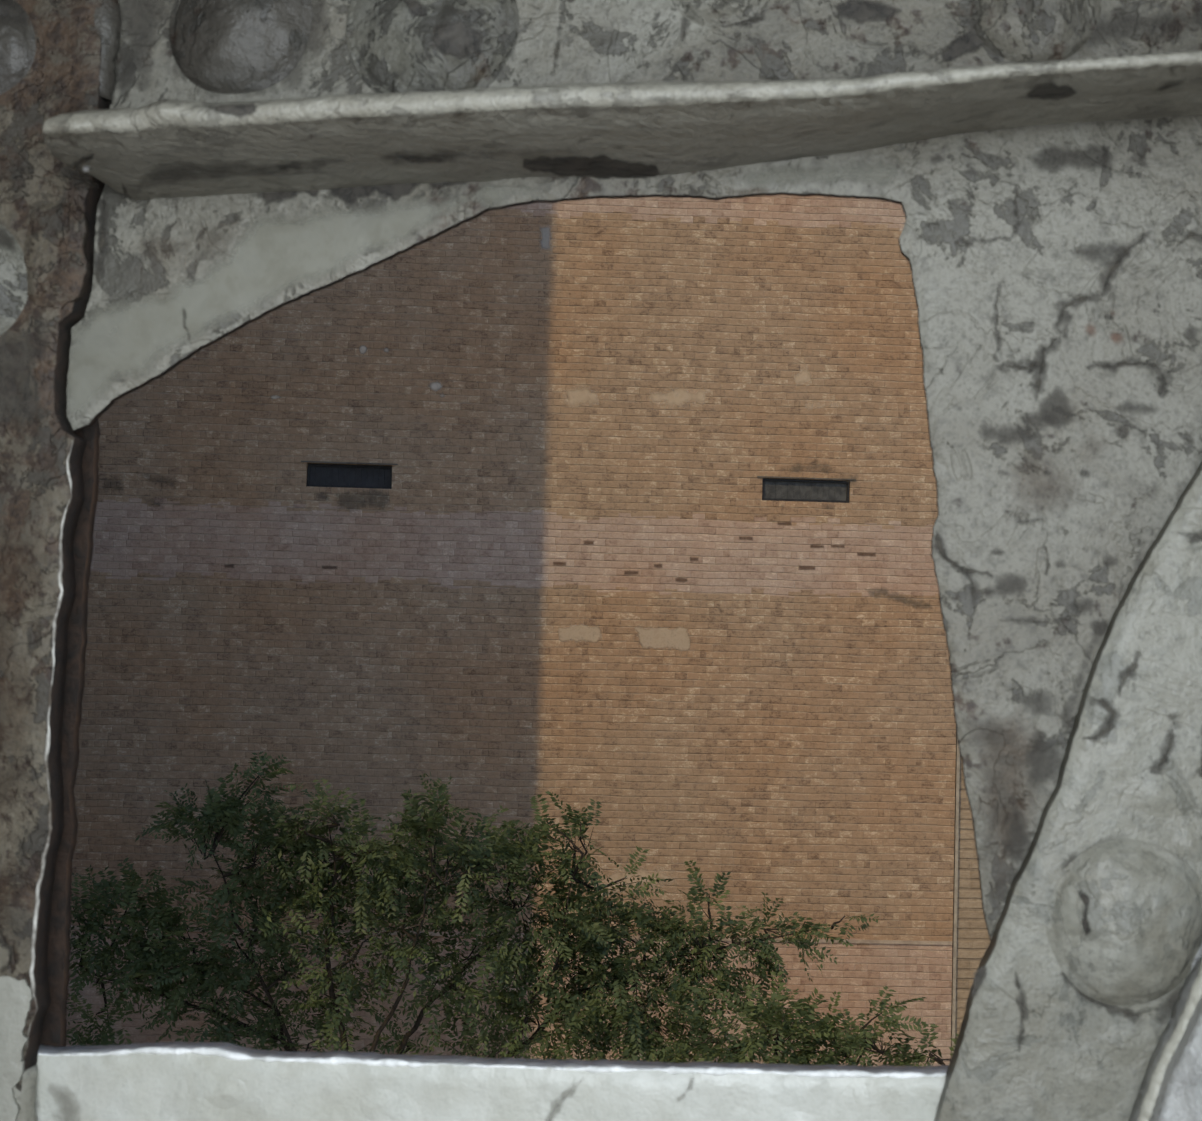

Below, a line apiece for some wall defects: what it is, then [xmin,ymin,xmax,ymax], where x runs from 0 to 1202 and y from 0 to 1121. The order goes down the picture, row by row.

crack [995,237,1144,387]
crack [1101,361,1157,370]
crack [935,535,993,600]
crack [1190,533,1202,541]
crack [1087,653,1139,739]
crack [1153,735,1174,772]